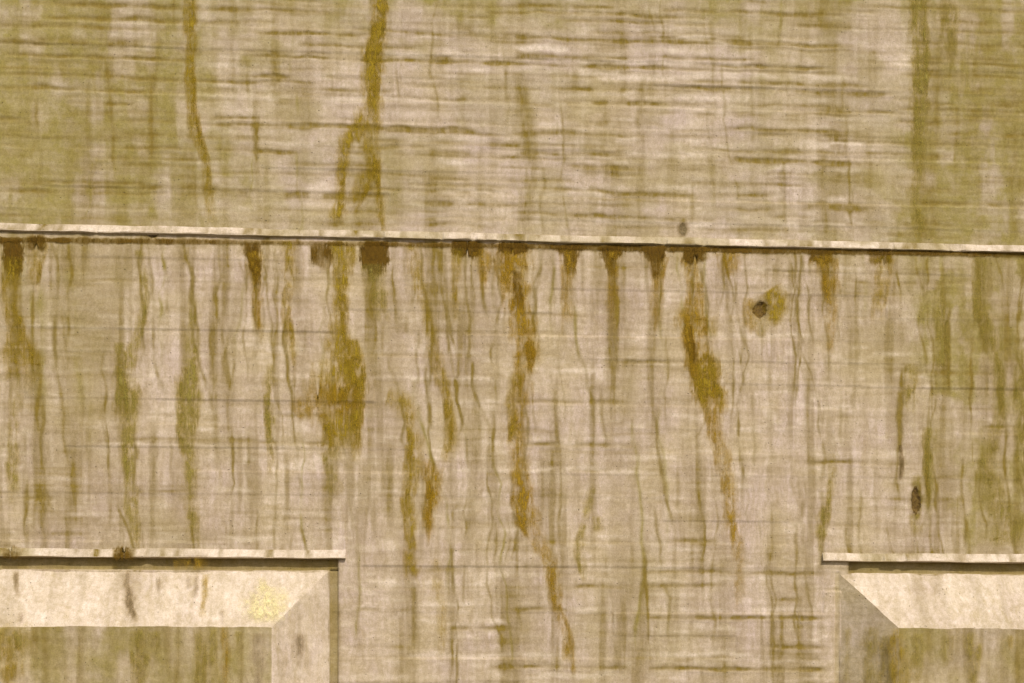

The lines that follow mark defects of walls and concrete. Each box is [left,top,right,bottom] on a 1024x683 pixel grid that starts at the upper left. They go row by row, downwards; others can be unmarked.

damp [185,0,196,123]
damp [338,0,385,195]
damp [1,235,44,279]
damp [558,244,580,272]
damp [598,245,622,273]
damp [644,245,665,285]